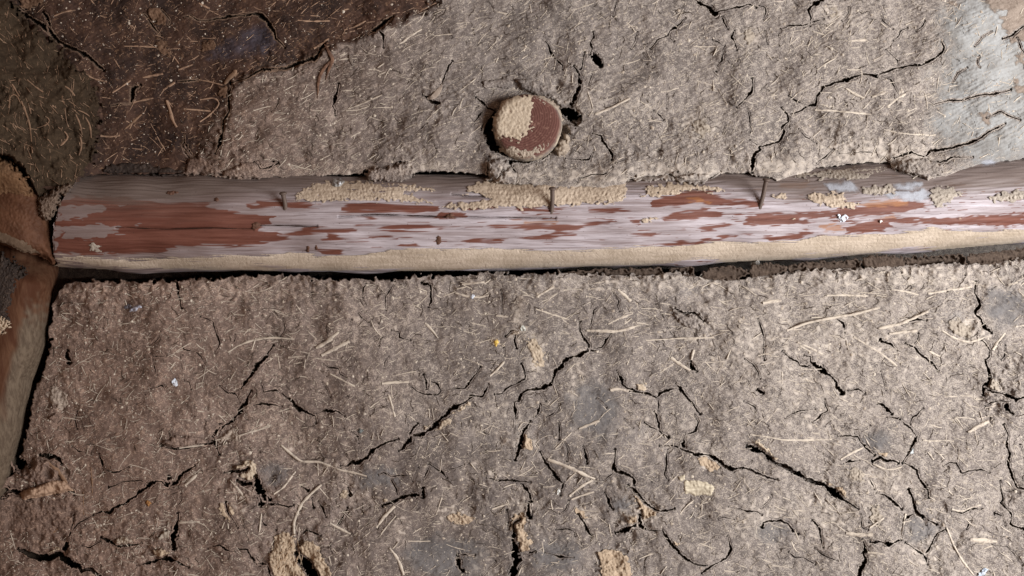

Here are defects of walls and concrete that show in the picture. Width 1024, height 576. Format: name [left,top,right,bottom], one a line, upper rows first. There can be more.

spalling [145,2,172,59]
crack [11,0,1024,185]
crack [3,264,1024,576]